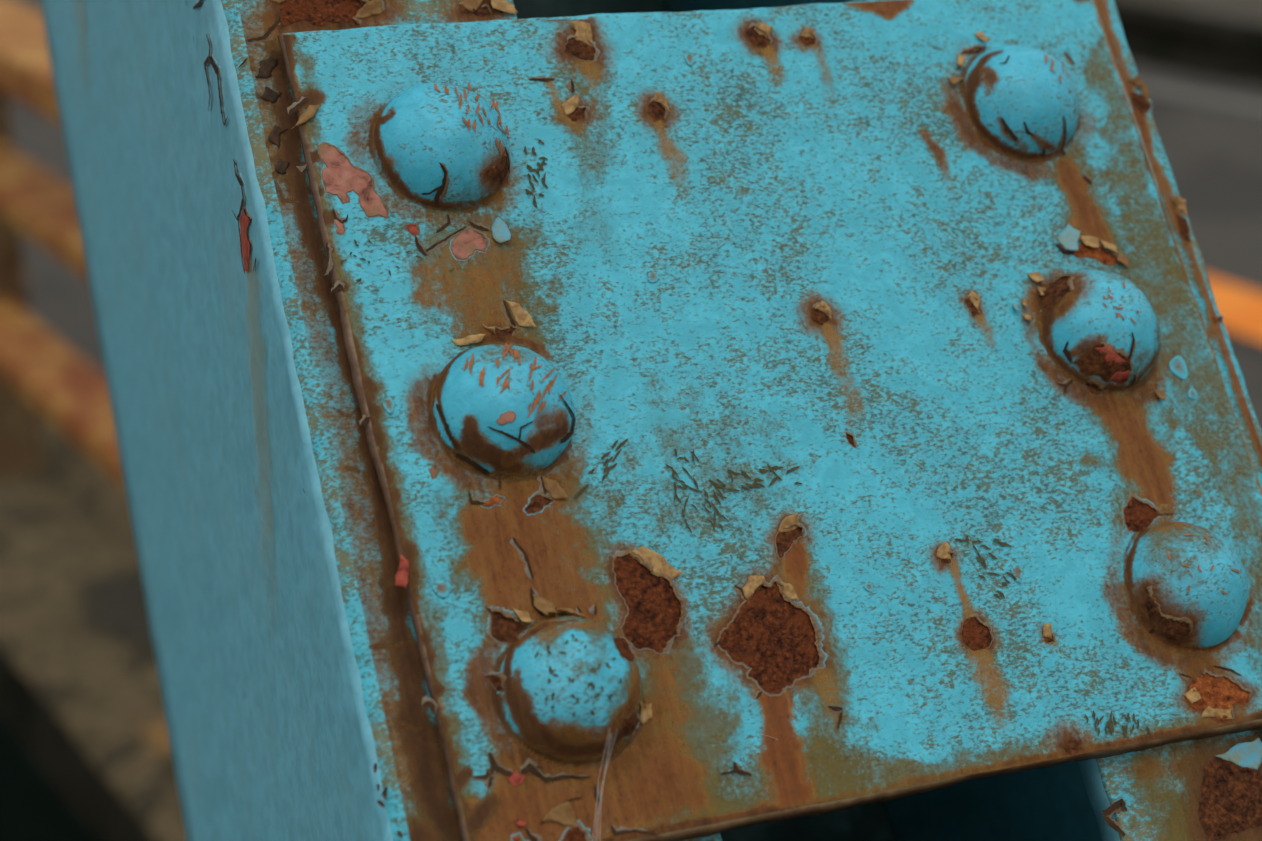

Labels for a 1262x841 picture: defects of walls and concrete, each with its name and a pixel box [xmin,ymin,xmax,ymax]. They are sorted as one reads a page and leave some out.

peeling [232,159,256,273]
corrosion [241,12,1262,841]
peeling [455,453,506,509]
peeling [523,474,570,515]
peeling [485,537,597,647]
peeling [624,701,652,739]
peeling [606,545,690,664]
peeling [708,512,838,807]
peeling [1126,578,1204,654]
peeling [1178,660,1258,727]
peeling [1185,738,1262,841]